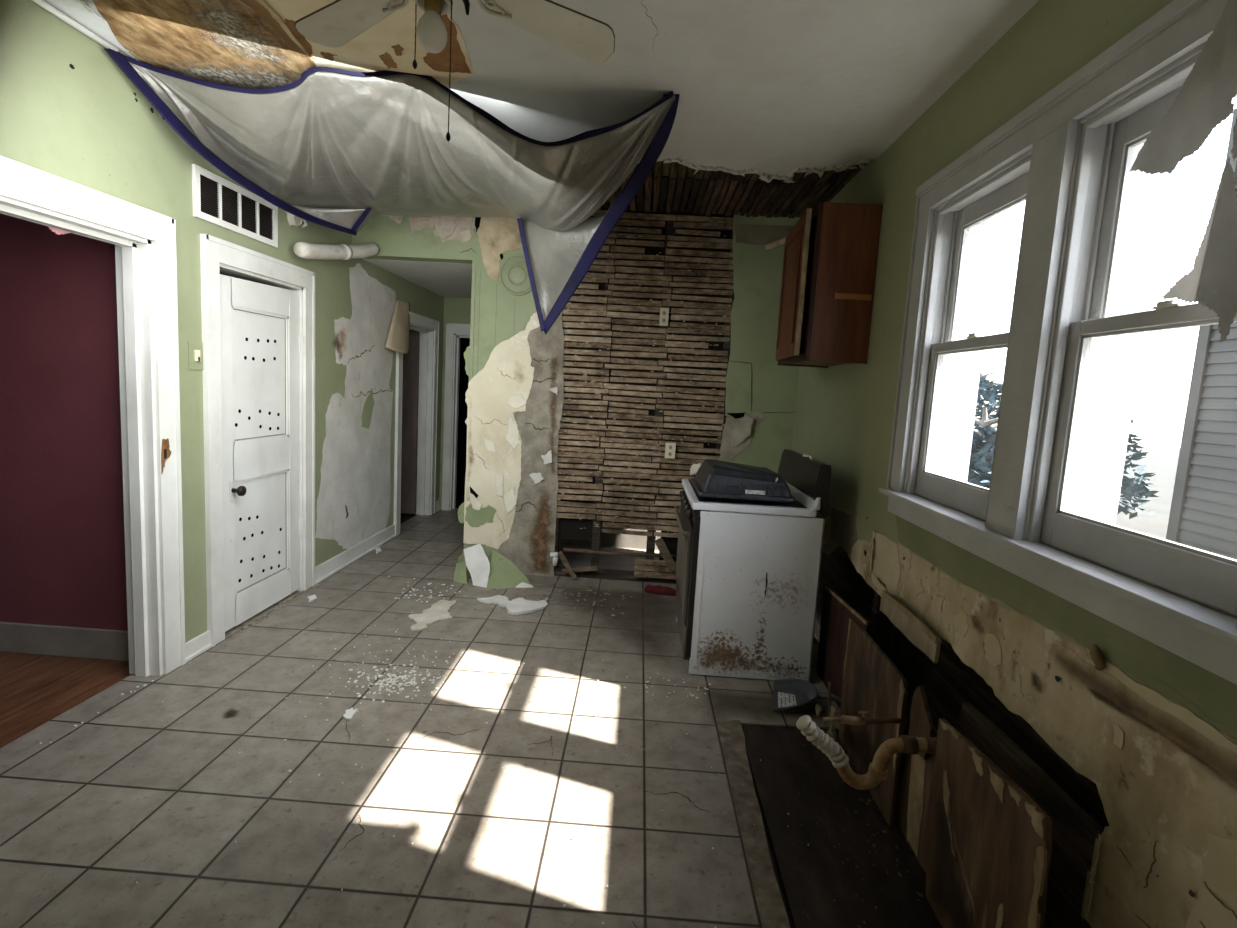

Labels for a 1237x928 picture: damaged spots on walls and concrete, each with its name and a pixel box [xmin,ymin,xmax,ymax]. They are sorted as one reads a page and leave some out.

flaking render [80,0,473,89]
flaking render [664,157,870,183]
peeling [315,263,396,549]
peeling [457,311,564,576]
rust [698,618,805,677]